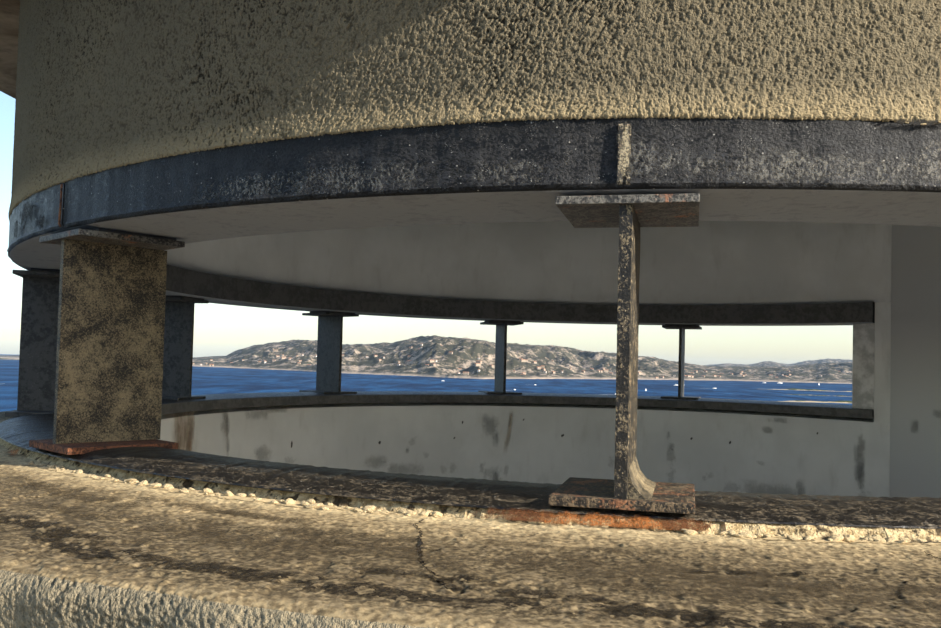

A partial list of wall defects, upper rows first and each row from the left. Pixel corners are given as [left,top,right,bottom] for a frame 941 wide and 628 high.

crack [415,519,448,589]
rust [485,508,711,531]